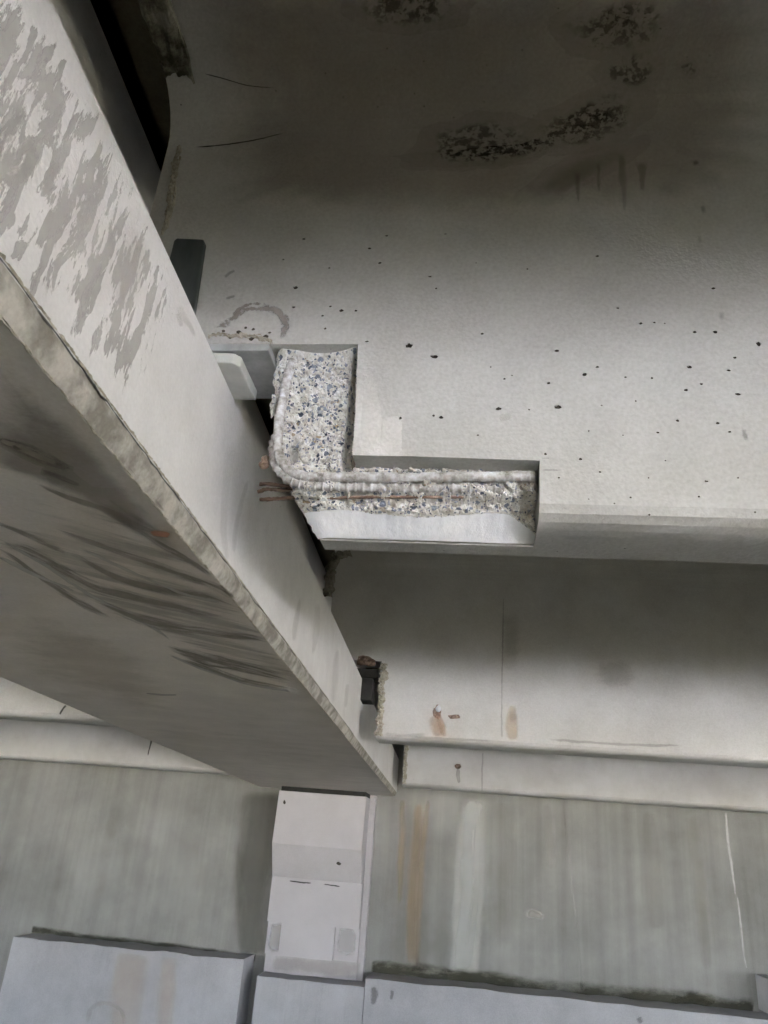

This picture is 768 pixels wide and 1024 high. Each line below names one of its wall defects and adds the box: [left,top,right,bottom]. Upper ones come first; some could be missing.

crack [201,134,278,147]
mould [441,105,623,158]
spalling [208,327,538,544]